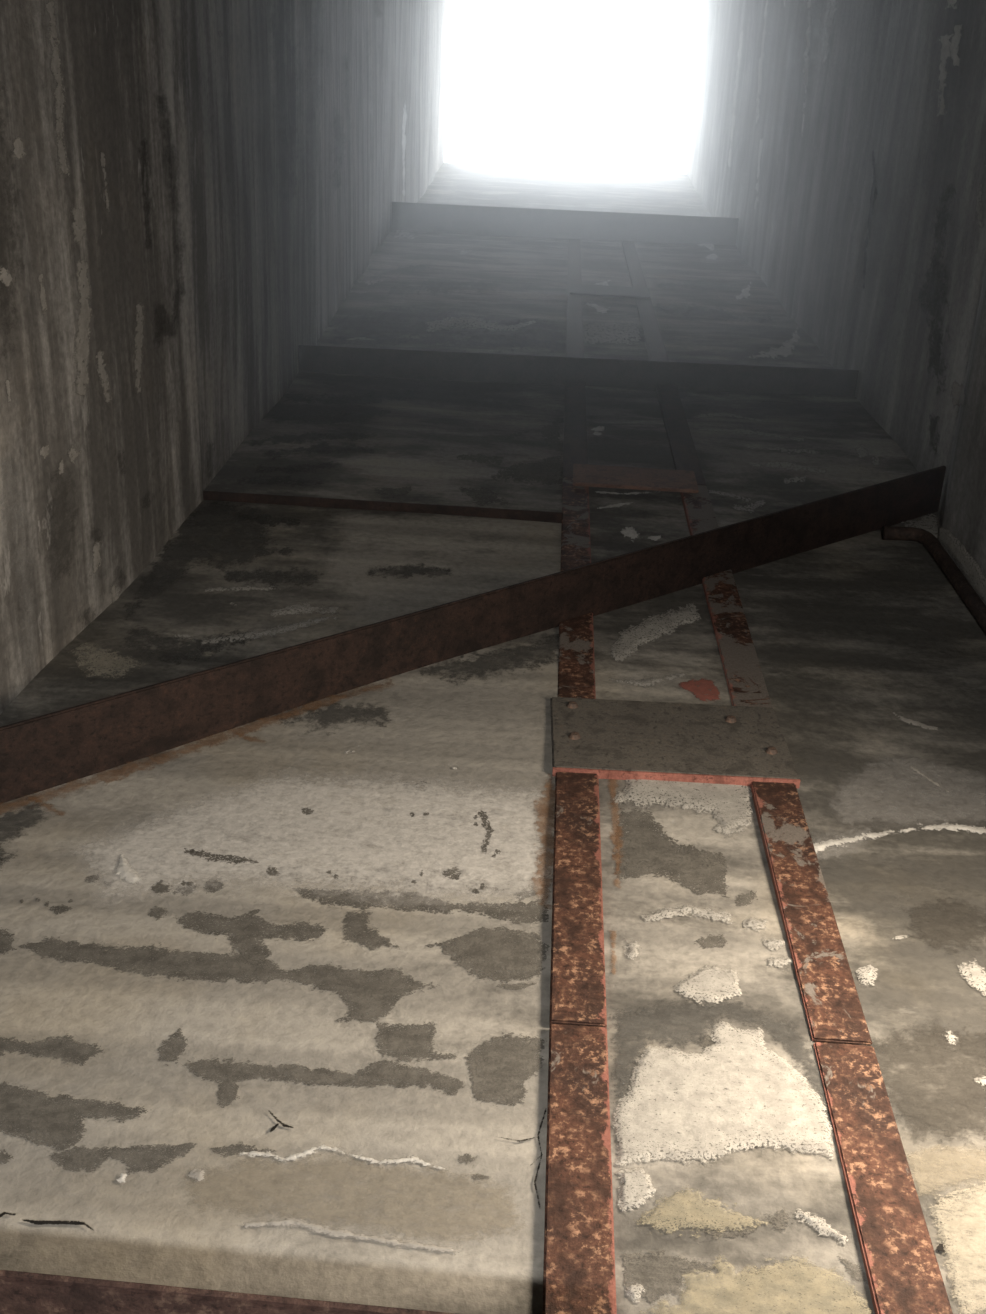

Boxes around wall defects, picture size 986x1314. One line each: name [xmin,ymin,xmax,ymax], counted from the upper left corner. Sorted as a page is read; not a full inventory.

damp [125,500,318,664]
damp [368,563,451,578]
damp [0,803,44,865]
damp [87,777,547,896]
damp [813,823,986,853]
crack [501,1109,546,1208]
damp [869,1026,986,1194]